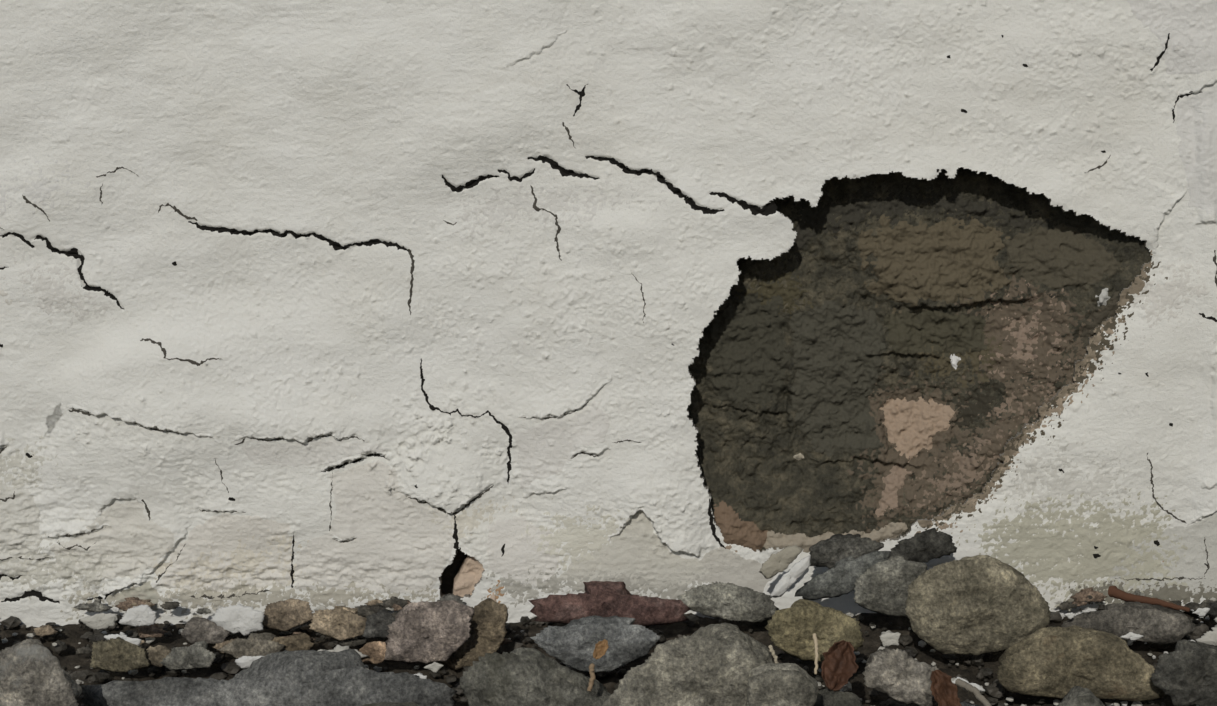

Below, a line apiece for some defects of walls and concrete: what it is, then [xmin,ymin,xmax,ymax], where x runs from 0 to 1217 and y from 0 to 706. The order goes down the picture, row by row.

peeling [500,28,569,70]
peeling [1127,0,1217,75]
crack [442,84,778,261]
crack [0,195,124,309]
crack [158,203,415,315]
crack [140,338,219,366]
spalling [0,77,1217,611]
crack [406,359,588,550]
crack [1116,453,1210,581]